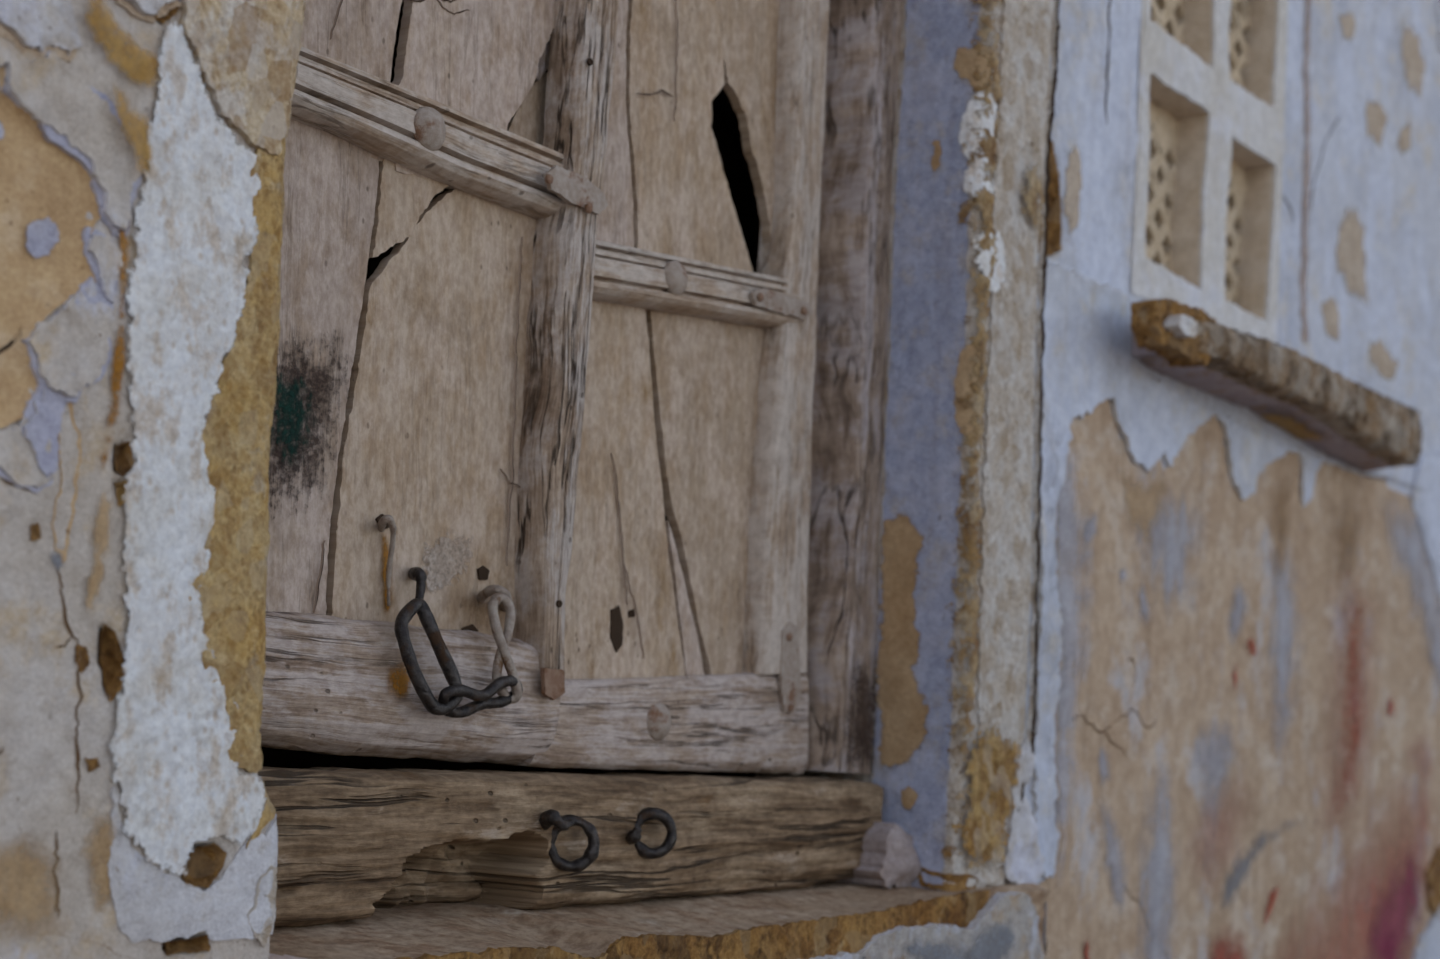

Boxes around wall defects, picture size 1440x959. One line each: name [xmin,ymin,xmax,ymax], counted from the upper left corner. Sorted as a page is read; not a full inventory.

peeling [931,140,942,171]
crack [0,304,49,353]
rust [102,226,129,462]
flaking render [0,0,306,875]
crack [1017,0,1156,811]
peeling [941,0,1440,959]
crack [52,568,83,918]
peeling [874,513,930,767]
flaking render [162,935,211,956]
peeling [247,865,307,959]
spalling [394,890,991,959]